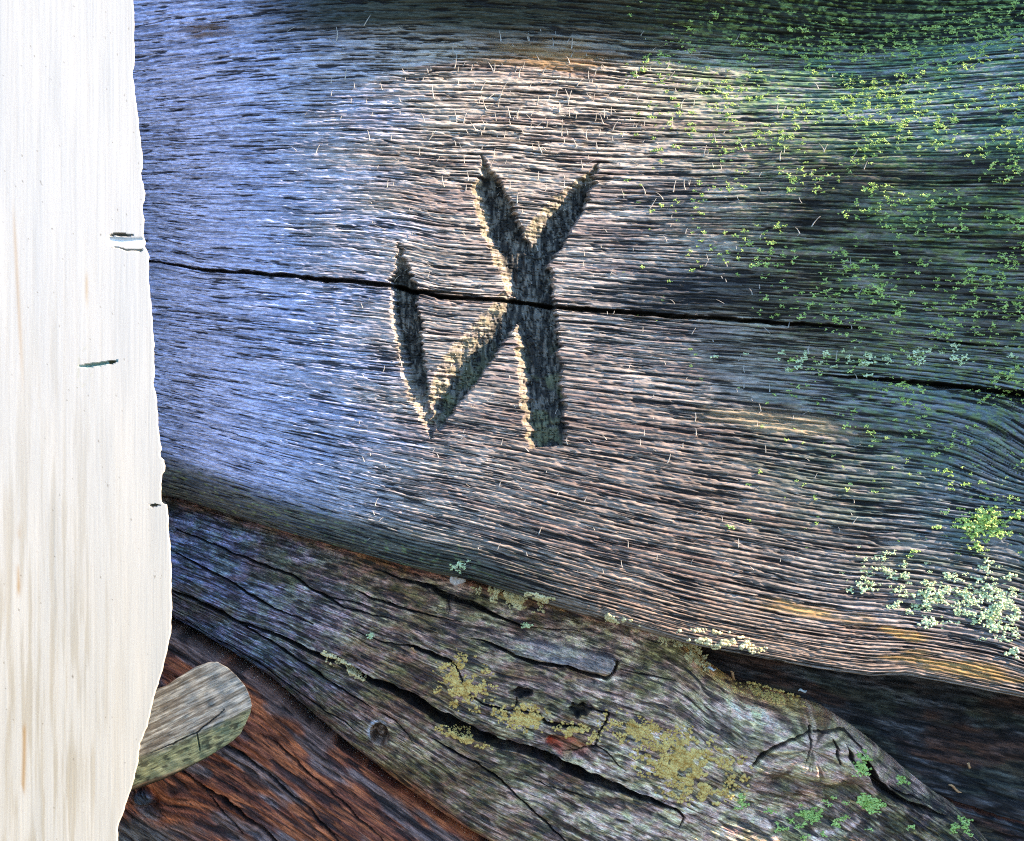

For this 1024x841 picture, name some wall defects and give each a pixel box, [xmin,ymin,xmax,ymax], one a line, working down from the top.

crack [149,259,875,330]
crack [903,335,1018,348]
crack [814,373,1024,403]
crack [147,528,687,841]
crack [751,724,1024,825]